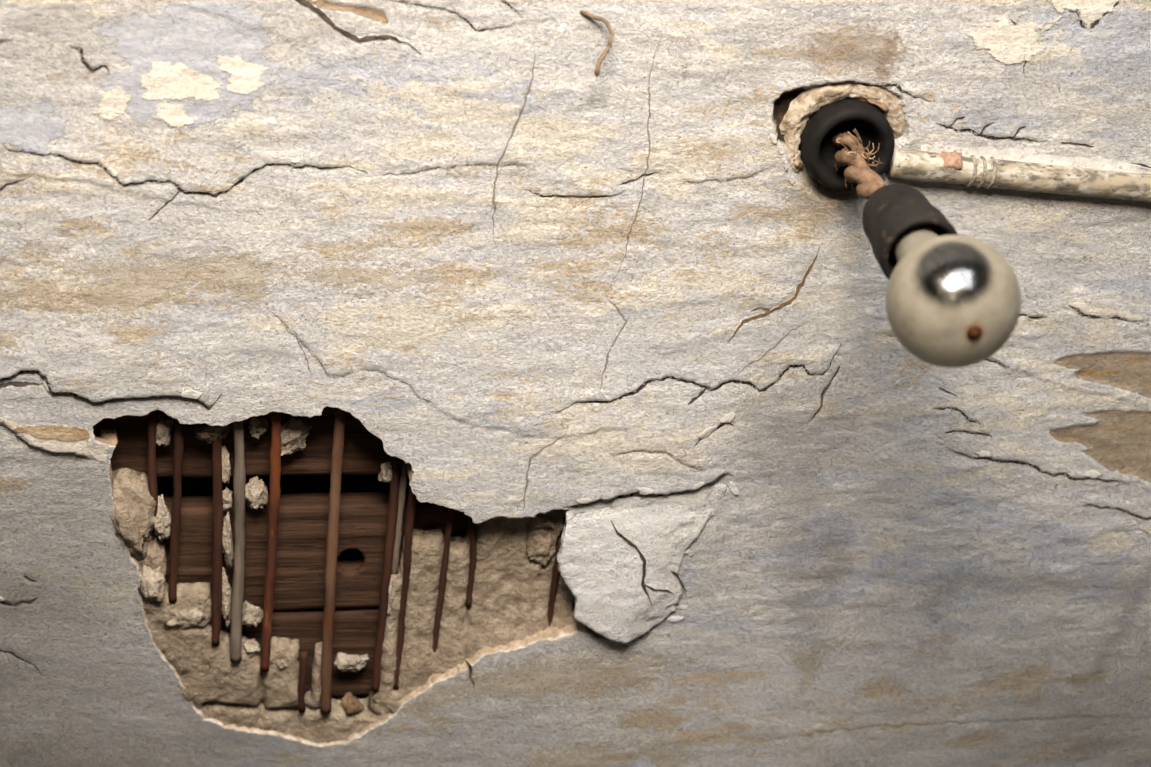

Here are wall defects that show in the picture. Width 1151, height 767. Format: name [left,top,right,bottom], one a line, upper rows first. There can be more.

peeling [91,0,330,134]
crack [390,0,522,32]
peeling [966,0,1119,65]
spalling [770,81,905,185]
crack [826,81,1094,147]
crack [0,37,841,511]
peeling [1054,351,1151,398]
crack [932,387,1151,520]
peeling [1049,410,1151,482]
crack [0,575,39,606]
spalling [0,406,703,748]
crack [0,649,42,676]